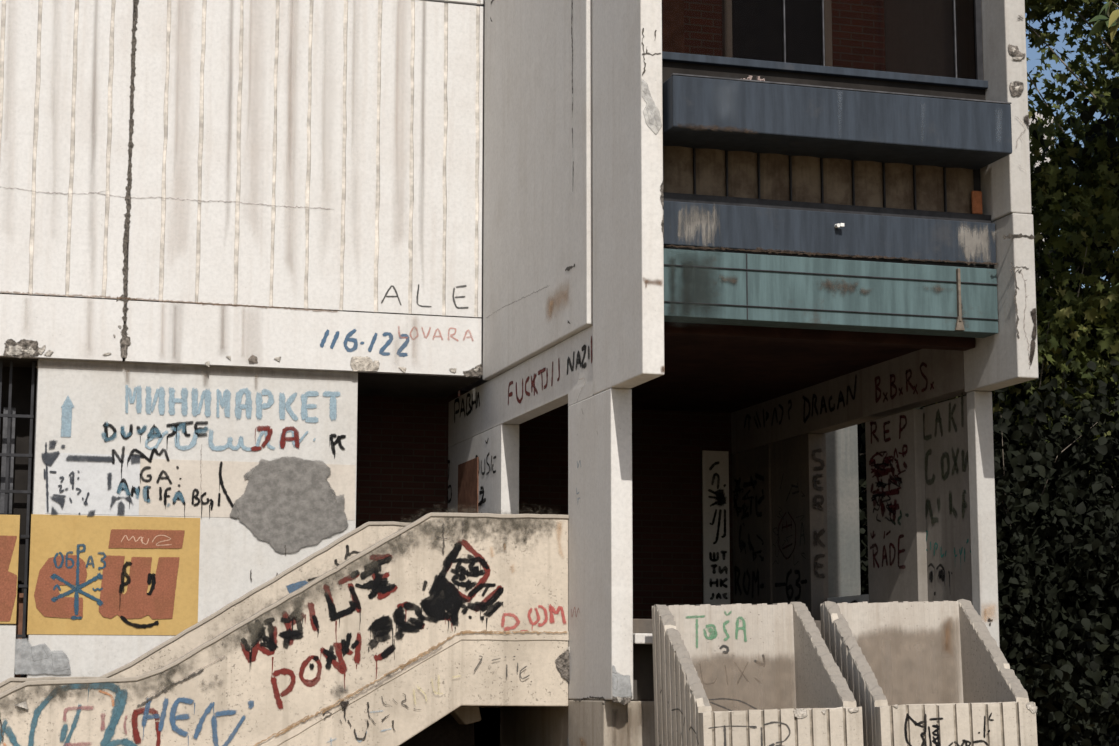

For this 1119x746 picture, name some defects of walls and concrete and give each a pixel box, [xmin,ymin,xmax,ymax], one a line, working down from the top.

crack [116,0,139,338]
peeling [678,206,717,243]
peeling [958,226,995,260]
crack [1003,233,1035,338]
spalling [3,339,53,358]
peeling [230,457,348,553]